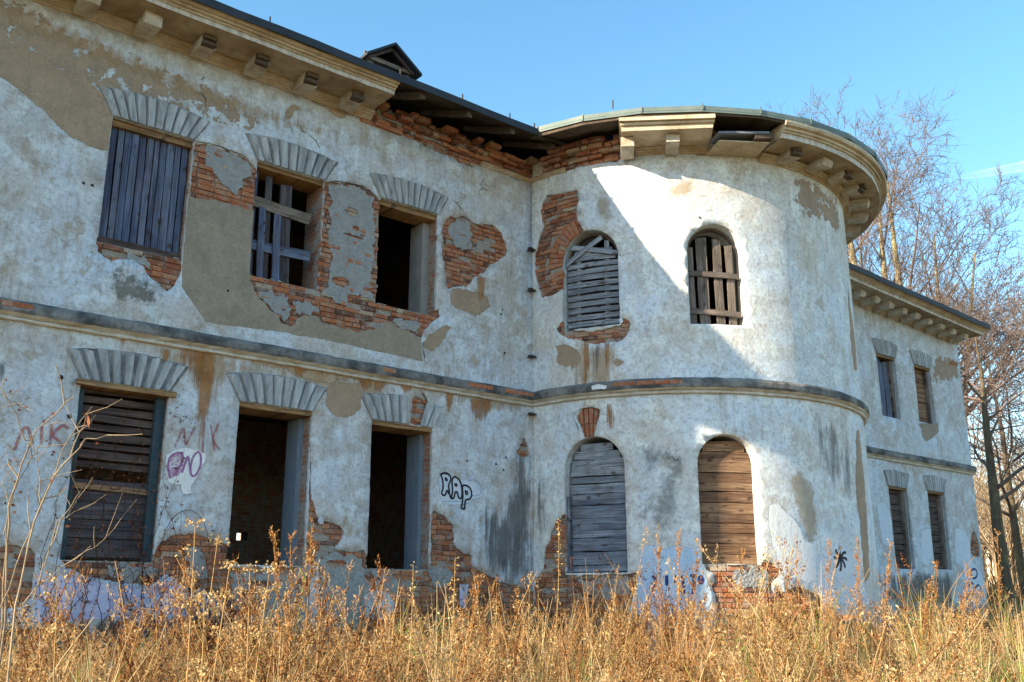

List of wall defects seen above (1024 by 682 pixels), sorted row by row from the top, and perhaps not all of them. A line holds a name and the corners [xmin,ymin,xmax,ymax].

flaking render [313,101,621,178]
flaking render [96,142,451,361]
spalling [435,217,507,316]
spalling [535,191,584,301]
peeling [793,179,839,231]
spalling [556,318,631,368]
peeling [933,356,958,384]
spalling [577,408,600,438]
water stain [485,456,540,576]
spalling [63,489,638,671]